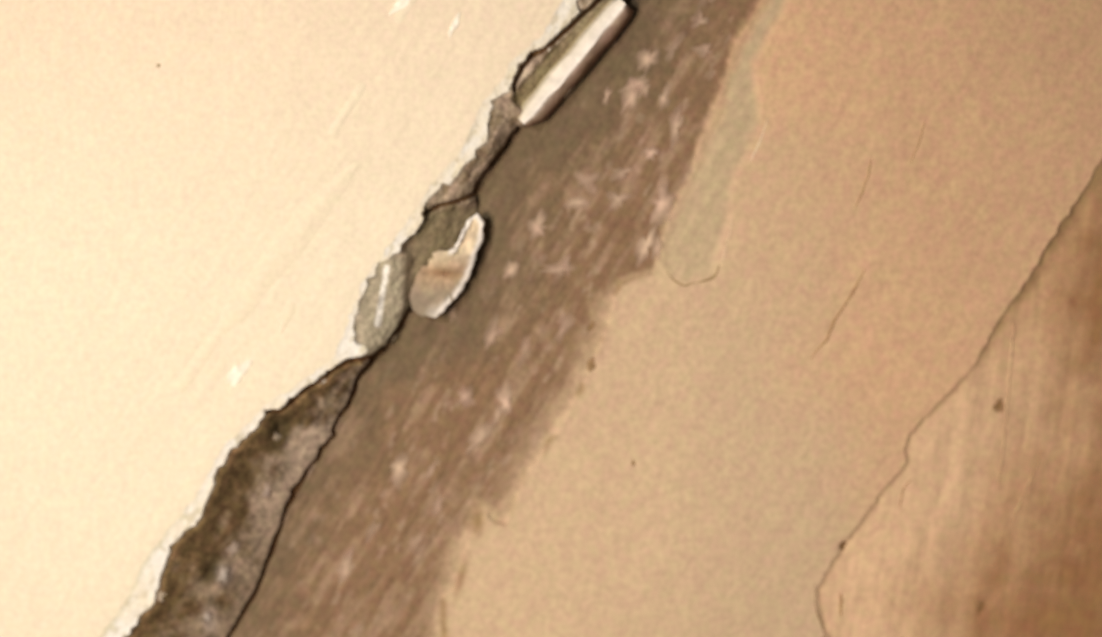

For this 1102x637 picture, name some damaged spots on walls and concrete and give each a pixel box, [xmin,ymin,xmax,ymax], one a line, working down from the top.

crack [227,307,413,637]
peeling [98,0,763,637]
crack [422,126,520,215]
crack [512,0,602,91]
peeling [815,158,1102,637]